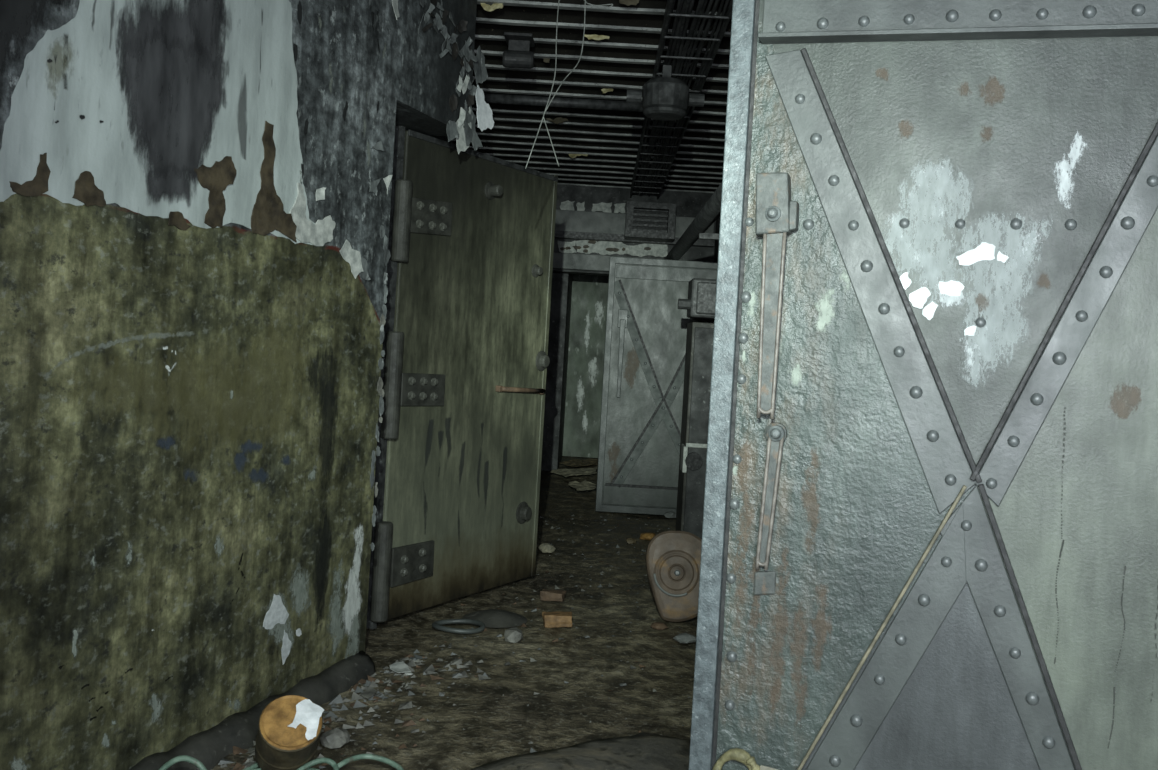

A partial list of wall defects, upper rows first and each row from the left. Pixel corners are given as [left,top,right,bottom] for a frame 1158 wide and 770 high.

damp [189,0,223,65]
peeling [419,0,494,154]
damp [148,165,196,206]
peeling [1054,131,1087,209]
peeling [0,0,392,527]
peeling [884,159,1053,387]
damp [75,332,192,375]
damp [308,353,337,480]
corrosion [1111,386,1141,418]
spalling [263,566,311,664]
damp [313,509,364,659]
corrosion [732,443,831,724]